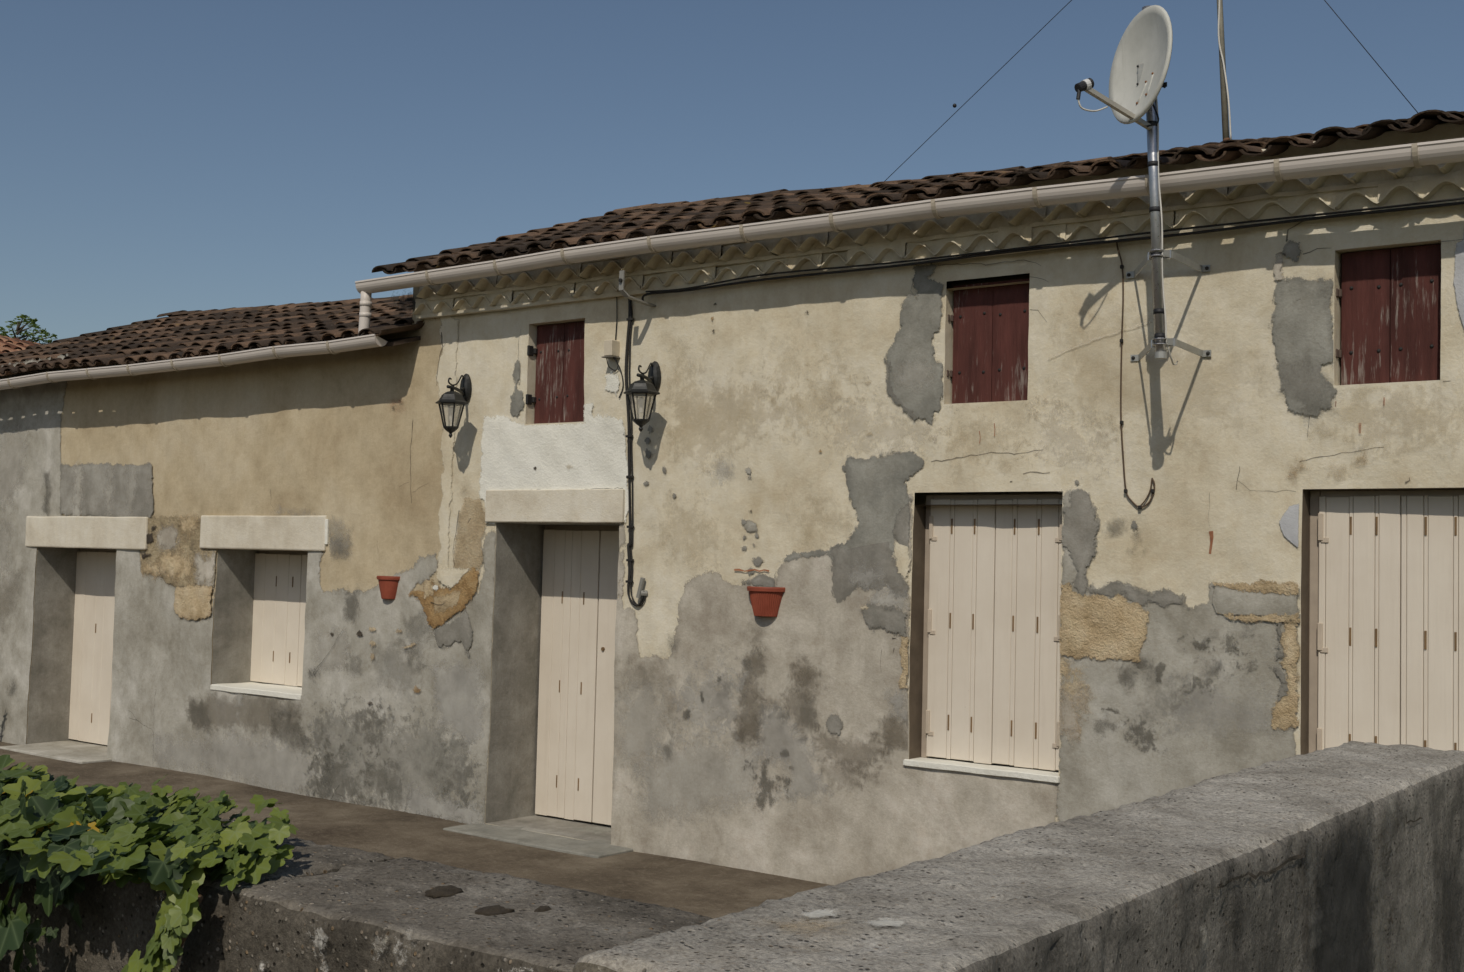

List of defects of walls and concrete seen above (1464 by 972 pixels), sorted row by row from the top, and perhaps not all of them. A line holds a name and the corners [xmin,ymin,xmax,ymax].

peeling [408,316,485,629]
spalling [140,515,216,621]
leakage [673,668,820,810]
leakage [860,603,907,637]
leakage [876,693,908,748]
peeling [893,541,911,584]
flaking render [1059,582,1150,739]
flaking render [1269,619,1300,731]